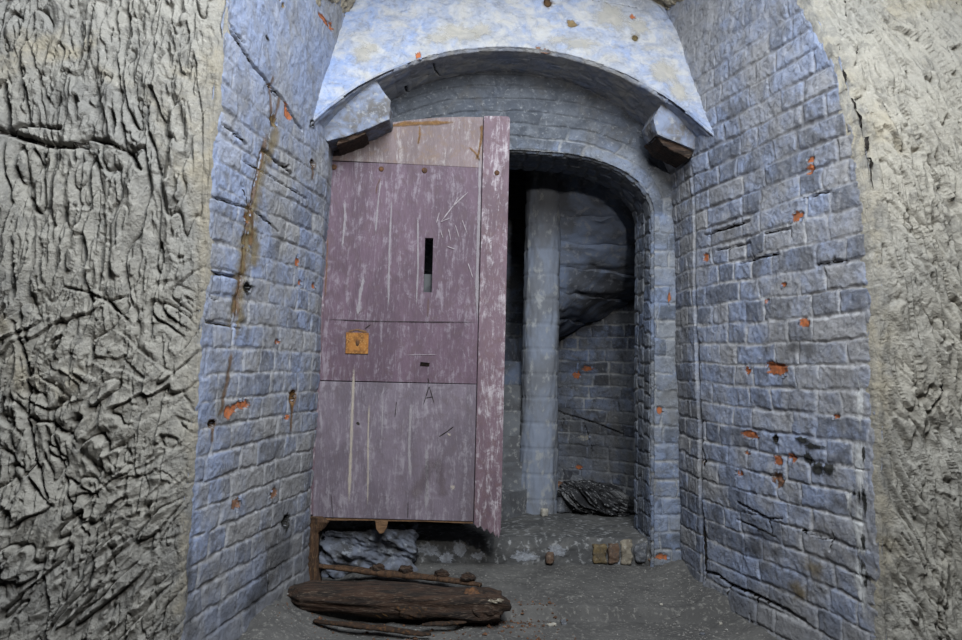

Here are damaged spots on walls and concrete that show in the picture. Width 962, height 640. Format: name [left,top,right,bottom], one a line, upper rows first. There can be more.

crack [839,33,874,189]
crack [0,126,141,170]
corrosion [230,77,280,328]
crack [69,288,125,317]
corrosion [219,355,232,414]
crack [15,323,98,529]
water stain [795,436,835,477]